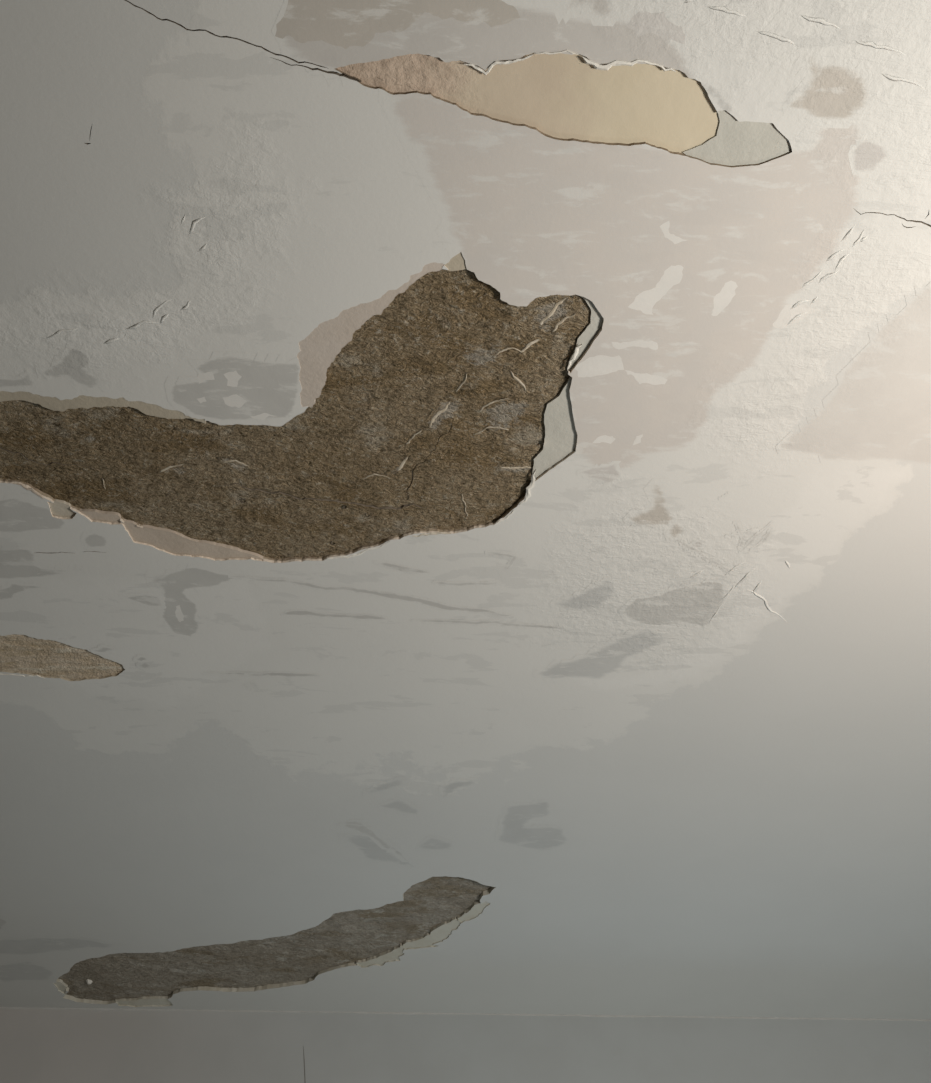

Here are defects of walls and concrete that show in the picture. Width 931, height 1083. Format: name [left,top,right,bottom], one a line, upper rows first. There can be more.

crack [125,0,362,82]
flaking render [0,0,891,642]
flaking render [0,634,125,681]
flaking render [53,876,496,1007]